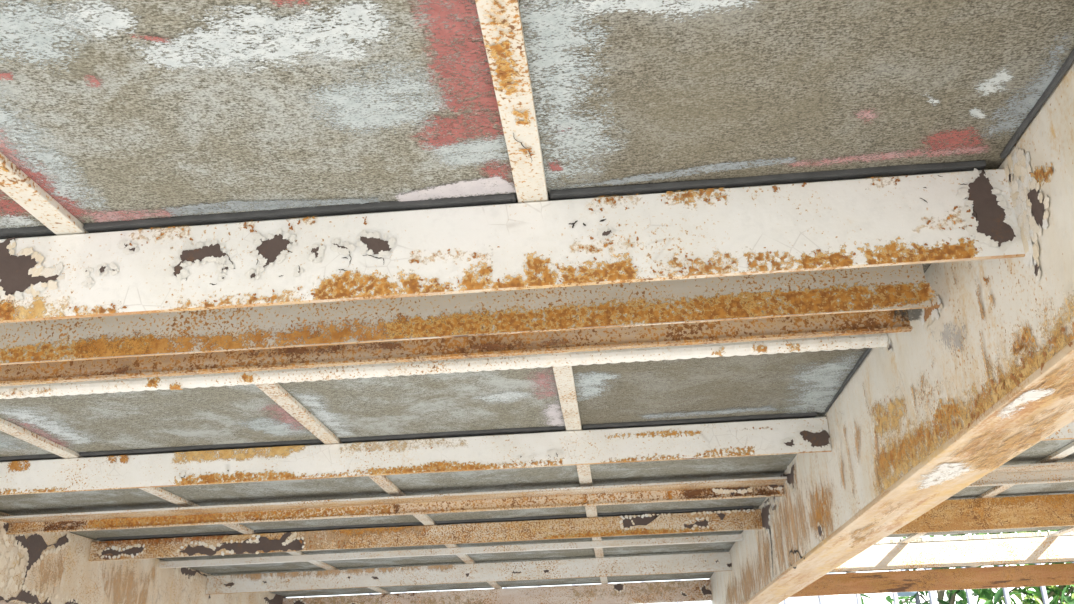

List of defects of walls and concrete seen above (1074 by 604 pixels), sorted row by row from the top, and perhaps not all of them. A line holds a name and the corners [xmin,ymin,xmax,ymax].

peeling [0,237,64,302]
peeling [166,229,396,282]
rust [176,236,641,309]
rust [653,206,981,284]
peeling [956,147,1049,282]
rust [0,281,935,375]
rust [862,275,1074,496]
rust [43,505,400,531]
rust [173,445,563,485]
peeling [682,425,831,536]
peeling [0,515,82,604]
peeling [172,532,306,604]